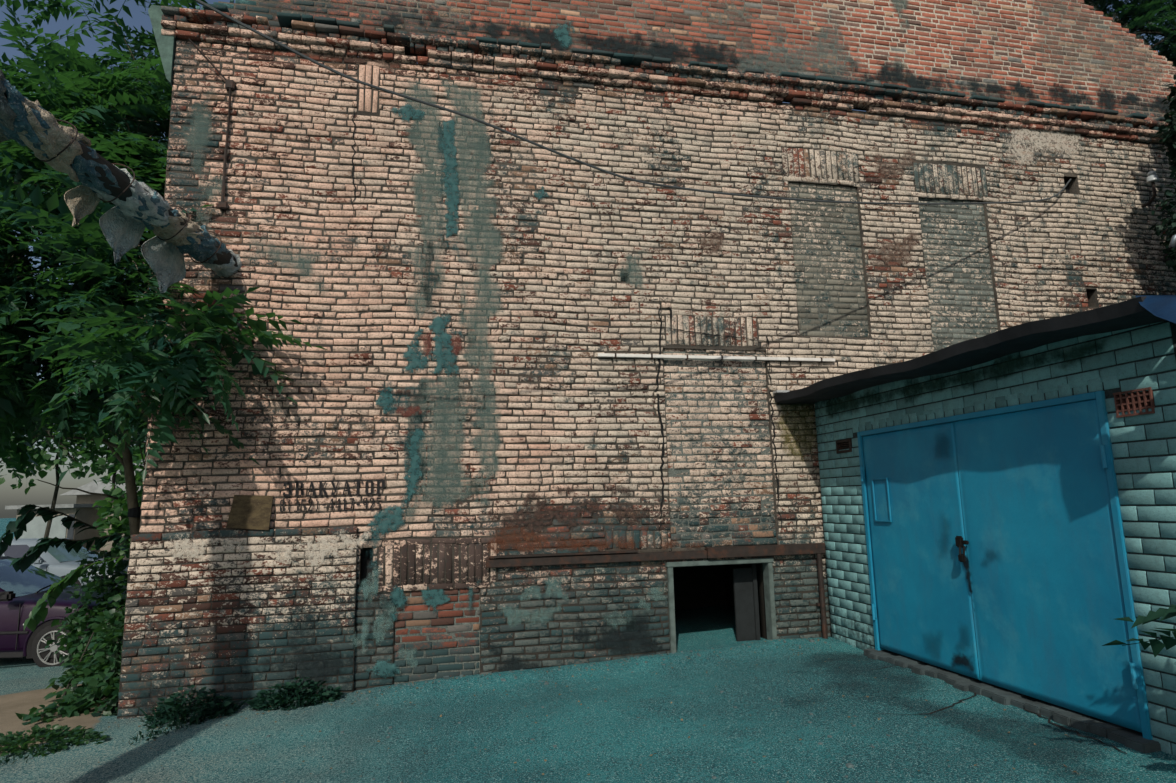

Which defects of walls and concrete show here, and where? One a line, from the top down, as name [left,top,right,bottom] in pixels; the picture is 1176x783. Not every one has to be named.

leakage [456,22,742,63]
leakage [851,60,1035,101]
leakage [1049,83,1174,112]
leakage [397,82,502,517]
crack [654,297,782,547]